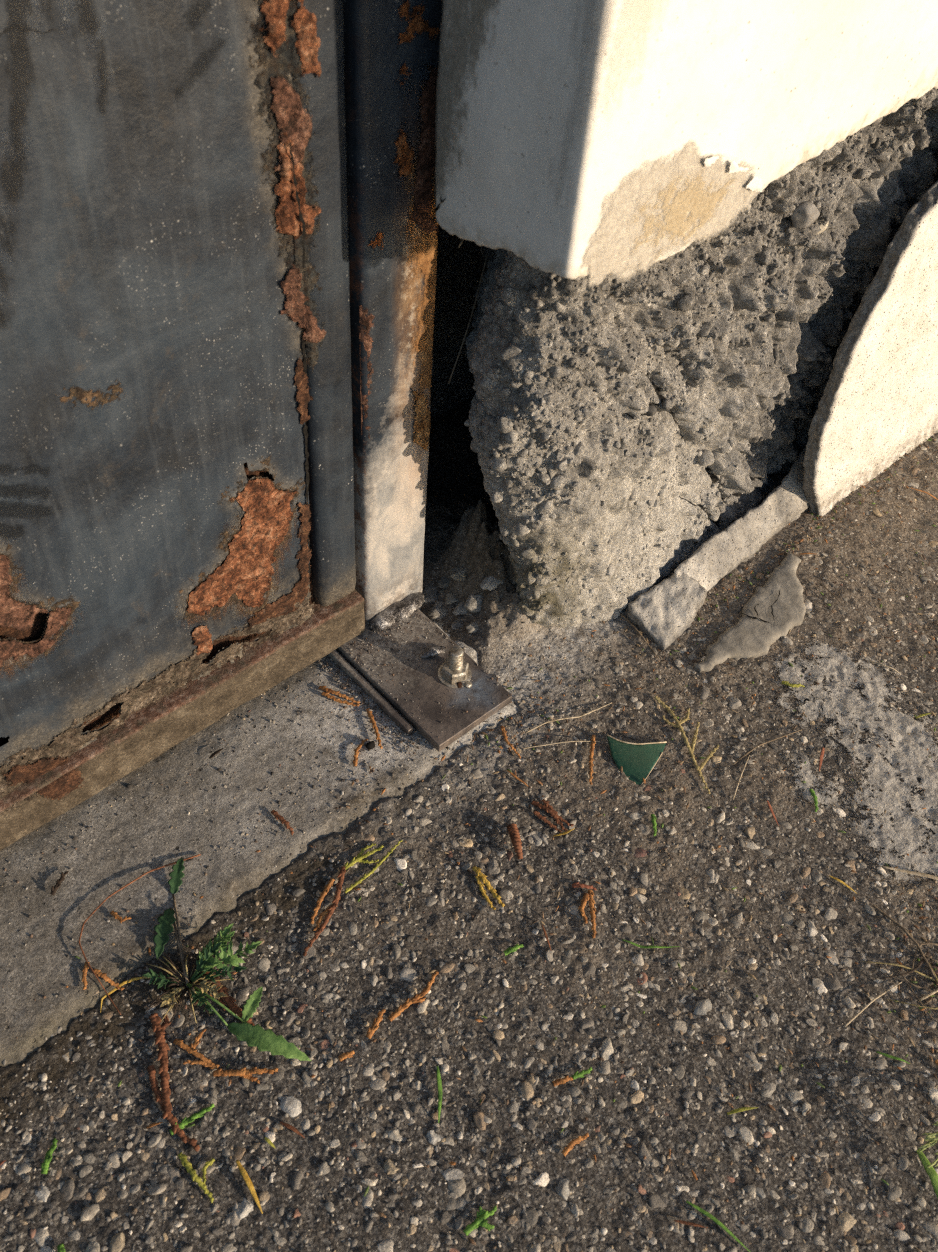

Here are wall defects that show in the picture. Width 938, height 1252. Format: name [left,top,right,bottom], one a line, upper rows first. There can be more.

rust [56,380,124,410]
rust [246,0,326,425]
rust [395,63,439,451]
rust [398,0,440,44]
spalling [464,88,938,628]
rust [0,456,314,815]